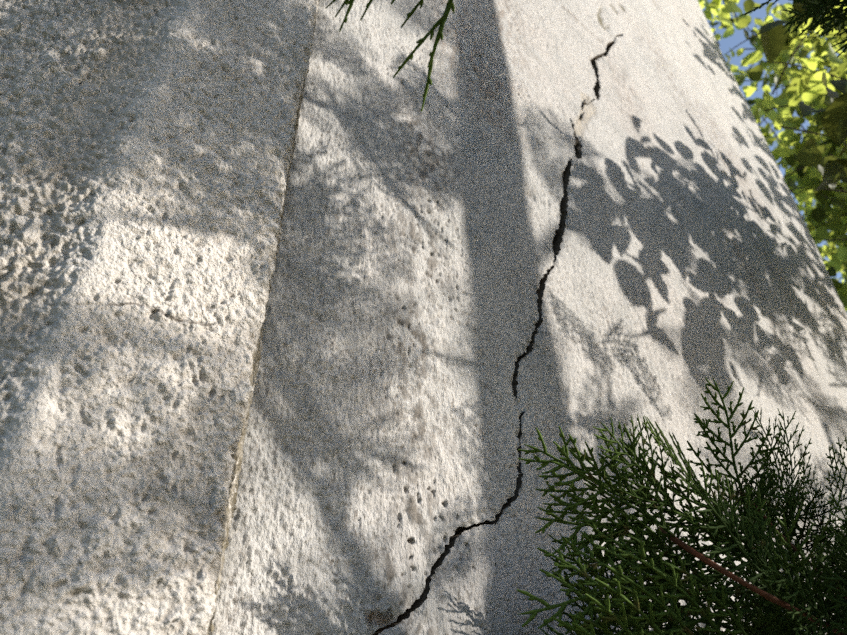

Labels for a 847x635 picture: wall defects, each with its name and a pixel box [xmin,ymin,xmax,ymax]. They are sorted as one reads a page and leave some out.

crack [373,34,622,635]